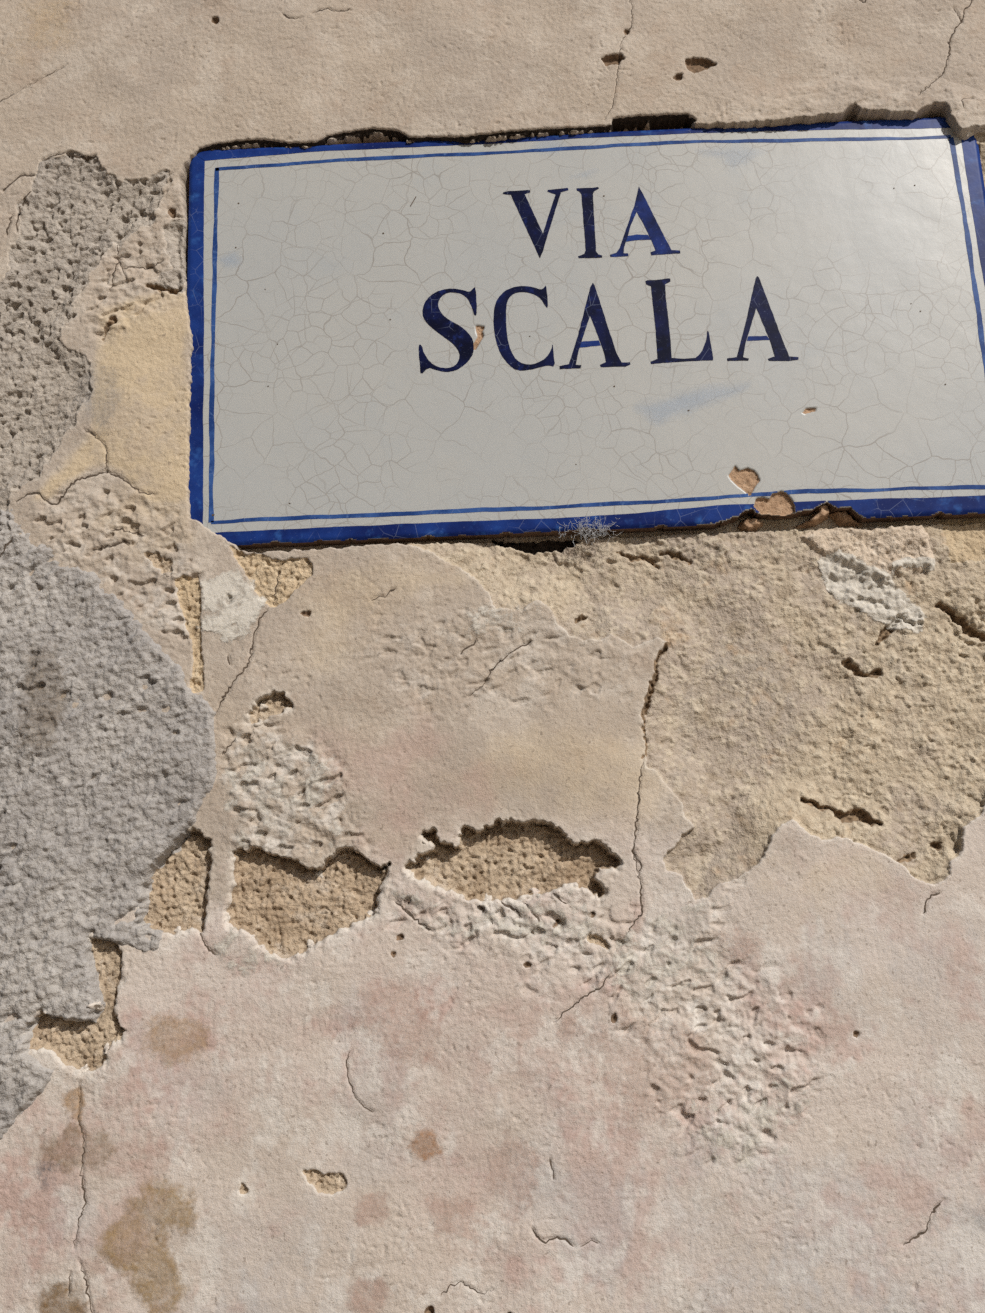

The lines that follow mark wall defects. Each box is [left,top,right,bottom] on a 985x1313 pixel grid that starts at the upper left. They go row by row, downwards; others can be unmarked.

crack [919,0,973,95]
peeling [0,151,188,515]
flaking render [144,552,204,693]
crack [934,602,985,642]
flaking render [144,829,212,935]
flaking render [226,817,620,958]
crack [557,642,670,1021]
crack [800,797,882,827]
crack [897,842,943,863]
flaking render [29,938,125,1073]
crack [68,1087,93,1313]